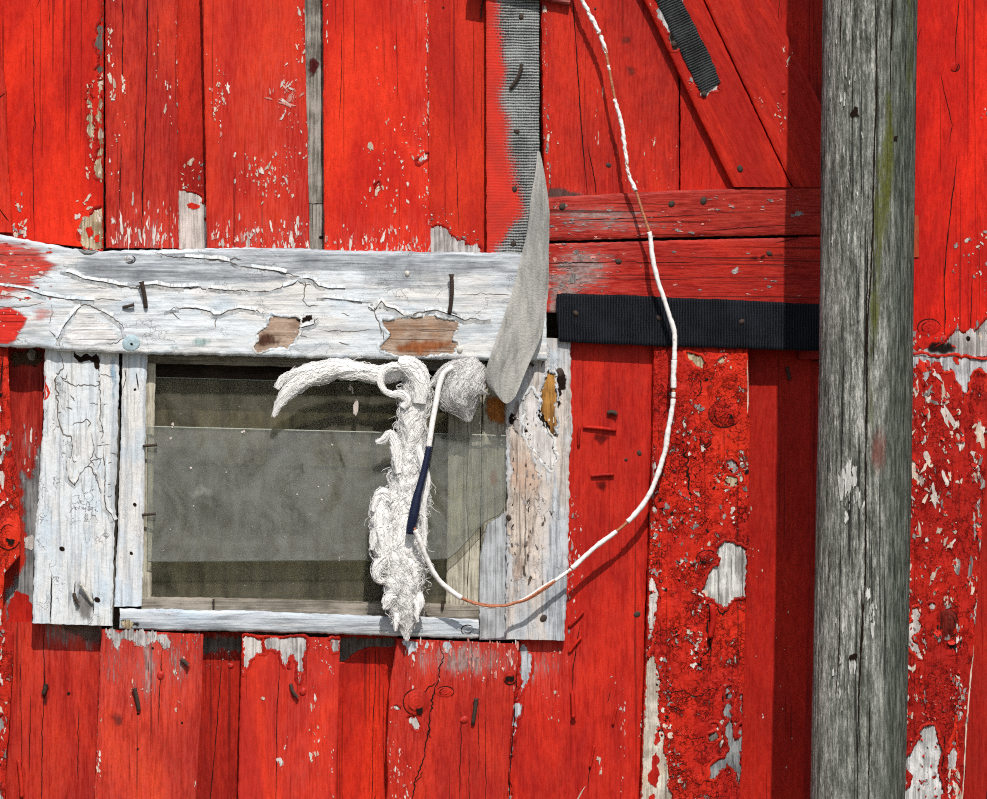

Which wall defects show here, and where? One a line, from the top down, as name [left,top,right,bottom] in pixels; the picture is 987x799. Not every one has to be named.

peeling [84,0,126,191]
crack [0,0,507,522]
peeling [251,312,303,355]
peeling [75,54,497,284]
peeling [675,428,711,459]
peeling [682,349,732,371]
peeling [0,423,41,685]
peeling [105,619,535,756]
crack [412,641,444,799]
peeling [639,444,759,799]
peeling [905,312,987,799]